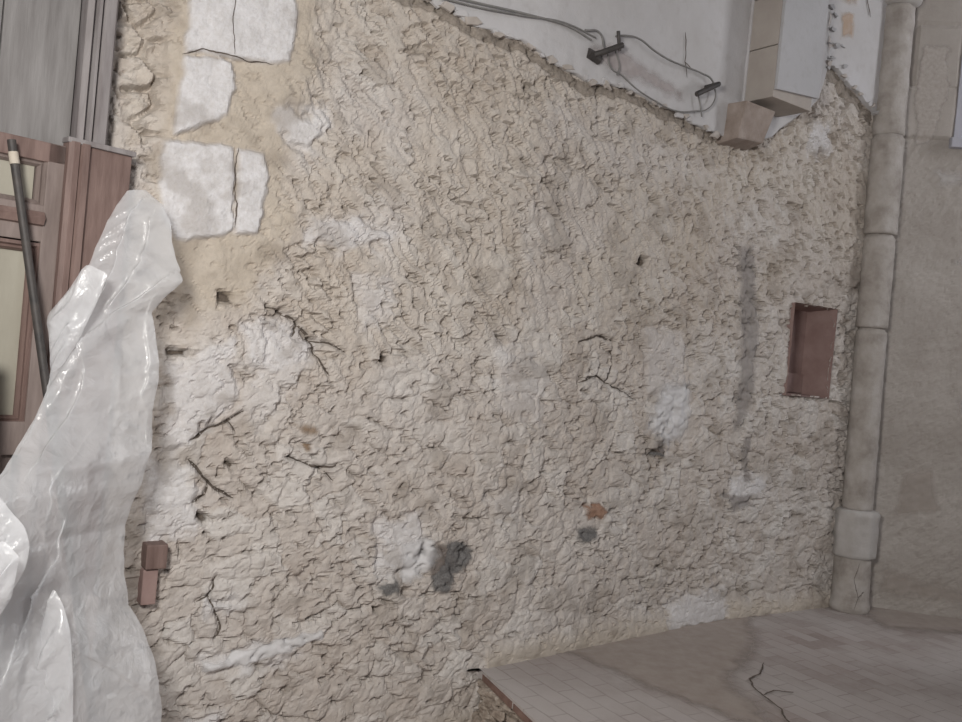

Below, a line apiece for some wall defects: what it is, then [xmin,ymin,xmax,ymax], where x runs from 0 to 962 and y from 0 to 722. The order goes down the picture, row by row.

flaking render [395,0,720,141]
flaking render [825,4,880,124]
crack [265,307,344,375]
crack [188,411,243,502]
crack [287,455,336,480]
crack [196,579,221,639]
crack [749,664,790,722]